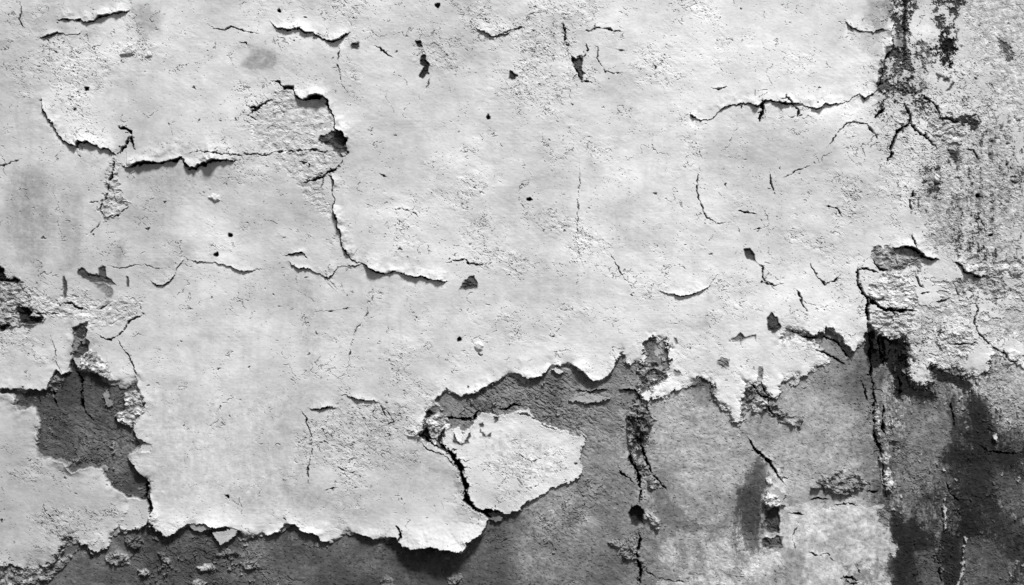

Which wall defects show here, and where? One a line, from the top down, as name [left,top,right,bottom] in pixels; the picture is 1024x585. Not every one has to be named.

flaking render [146,83,478,291]
crack [392,207,420,218]
crack [711,86,808,123]
leakage [648,0,1024,585]
crack [769,94,980,195]
peeling [0,229,1024,585]
crack [618,436,688,585]
crack [748,258,1024,585]